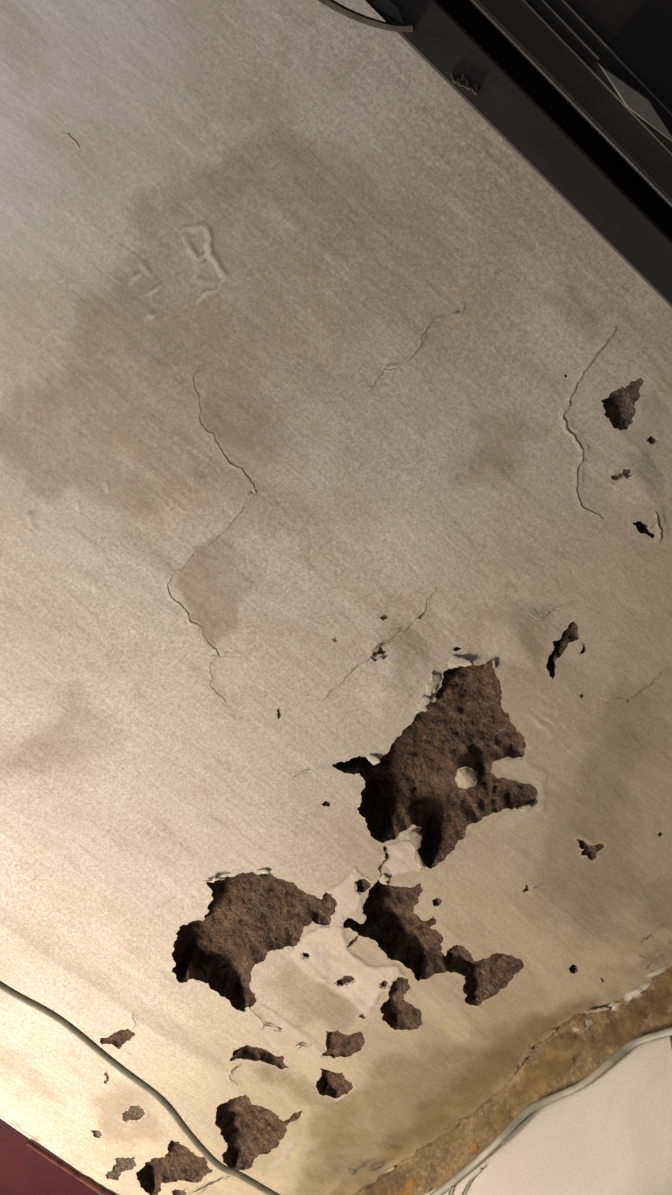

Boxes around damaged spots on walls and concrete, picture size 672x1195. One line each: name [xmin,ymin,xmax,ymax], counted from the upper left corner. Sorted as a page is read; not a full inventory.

crack [558,326,617,521]
spalling [601,378,643,431]
crack [163,361,309,705]
crack [650,511,663,544]
crack [311,586,437,703]
spalling [546,622,586,679]
spalling [172,647,537,1098]
spalling [106,1095,301,1195]